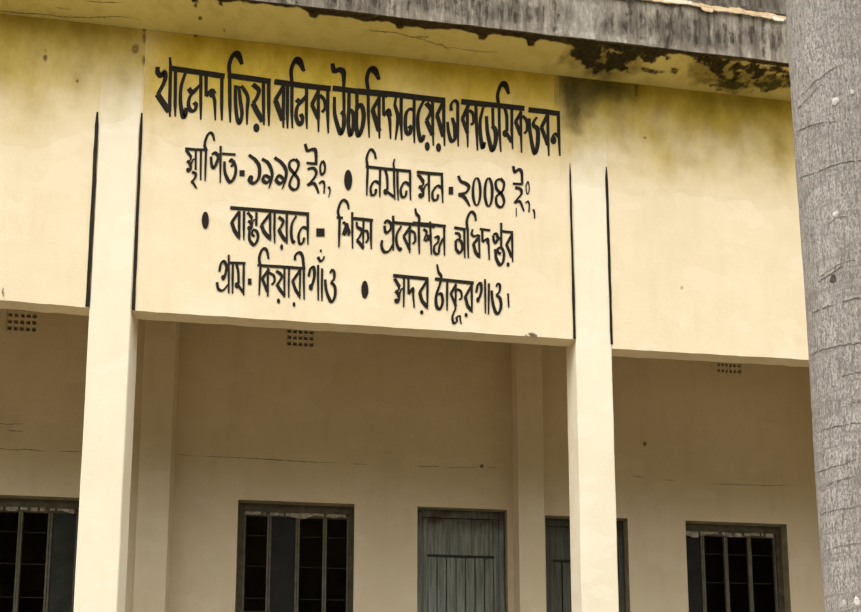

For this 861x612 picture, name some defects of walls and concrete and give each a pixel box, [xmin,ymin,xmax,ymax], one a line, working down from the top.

water stain [0,0,798,211]
crack [0,423,81,452]
crack [181,454,331,463]